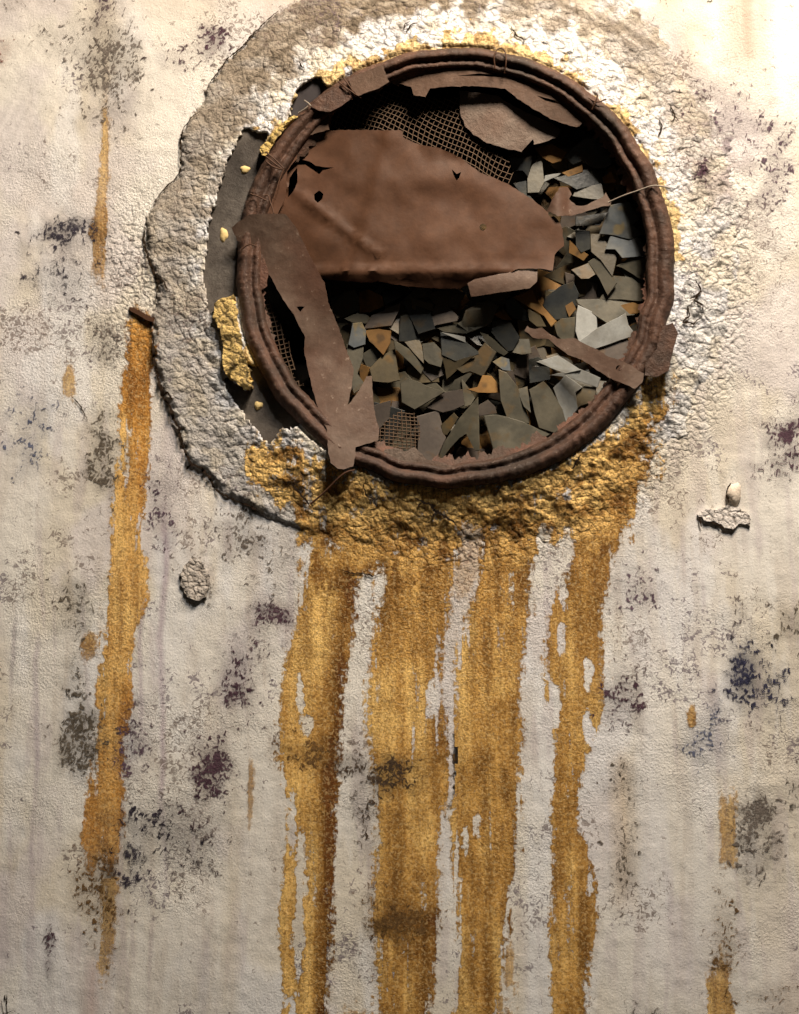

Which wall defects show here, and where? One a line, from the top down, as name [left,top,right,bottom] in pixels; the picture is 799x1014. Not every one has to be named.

leakage [0,0,147,150]
rust [88,108,109,276]
peeling [260,115,298,156]
rust [278,130,595,327]
rust [314,18,597,88]
rust [595,95,685,261]
leakage [78,406,182,578]
rust [78,304,159,974]
leakage [68,492,305,978]
leakage [272,727,423,849]
rust [244,373,680,1014]
leakage [676,596,799,757]